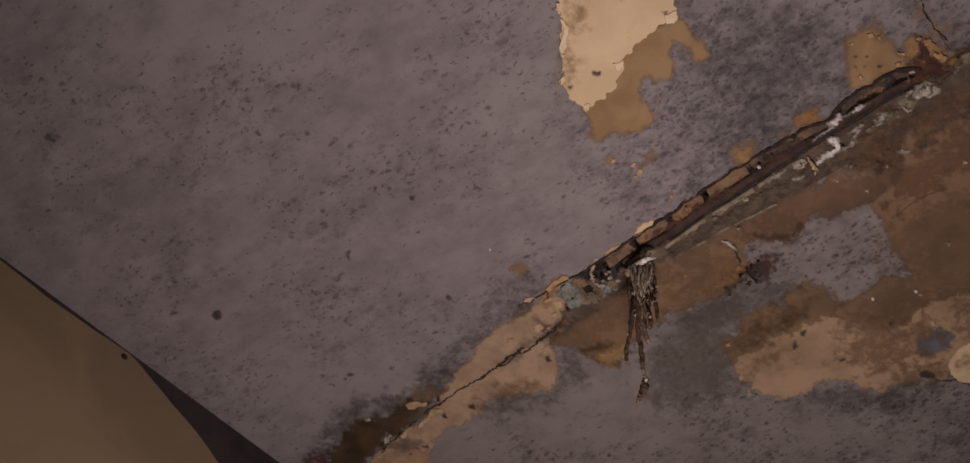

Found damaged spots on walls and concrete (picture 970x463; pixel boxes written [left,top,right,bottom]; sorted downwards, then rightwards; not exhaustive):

peeling [556,0,710,141]
peeling [846,28,970,90]
crack [921,1,952,52]
corrosion [795,108,824,128]
corrosion [721,240,778,283]
leakage [536,77,970,404]
peeling [732,290,970,399]
leakage [303,379,446,463]
crack [382,327,557,453]